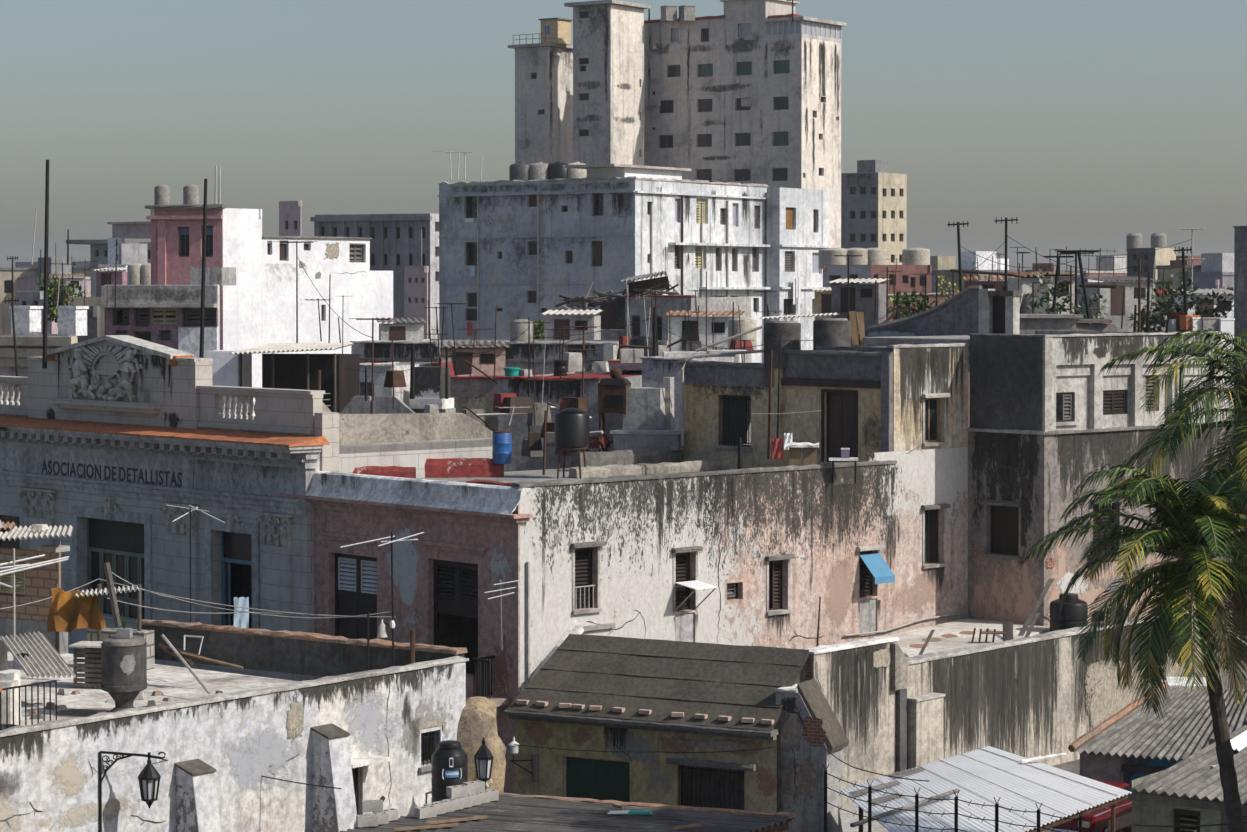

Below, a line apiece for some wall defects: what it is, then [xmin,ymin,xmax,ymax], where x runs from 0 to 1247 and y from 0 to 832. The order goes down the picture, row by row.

water stain [725,37,840,171]
peeling [385,525,422,633]
water stain [524,463,904,595]
water stain [924,567,944,589]
crack [0,802,43,827]
water stain [0,729,50,793]
water stain [76,696,254,741]
peeling [225,693,338,832]
water stain [274,663,454,749]
water stain [827,643,886,752]
water stain [926,614,1195,759]